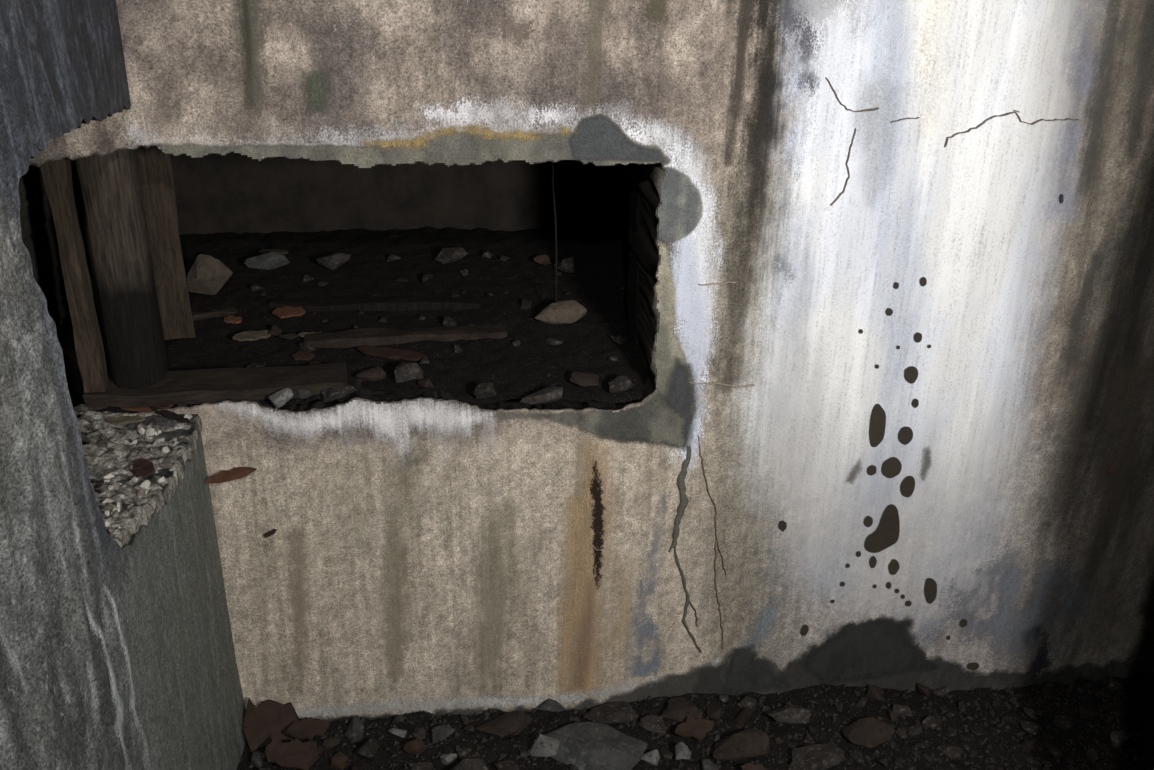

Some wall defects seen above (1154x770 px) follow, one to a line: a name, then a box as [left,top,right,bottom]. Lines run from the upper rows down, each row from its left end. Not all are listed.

crack [826,78,920,206]
crack [944,110,1080,147]
spalling [157,113,703,448]
water stain [219,0,1133,722]
rust [559,443,611,704]
crack [669,436,726,653]